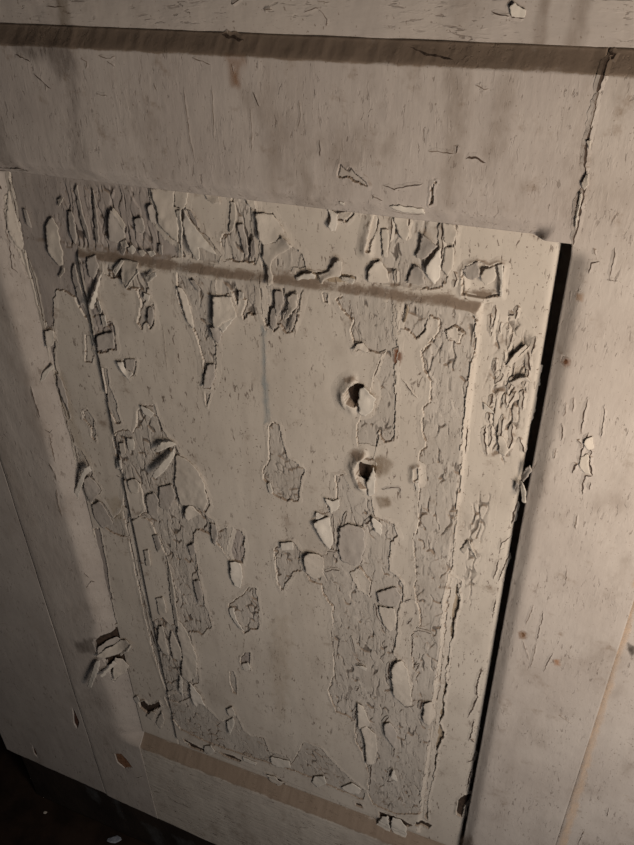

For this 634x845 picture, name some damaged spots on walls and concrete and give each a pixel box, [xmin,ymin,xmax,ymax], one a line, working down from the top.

peeling [492,3,526,22]
peeling [332,158,373,192]
crack [570,47,621,284]
peeling [0,171,485,838]